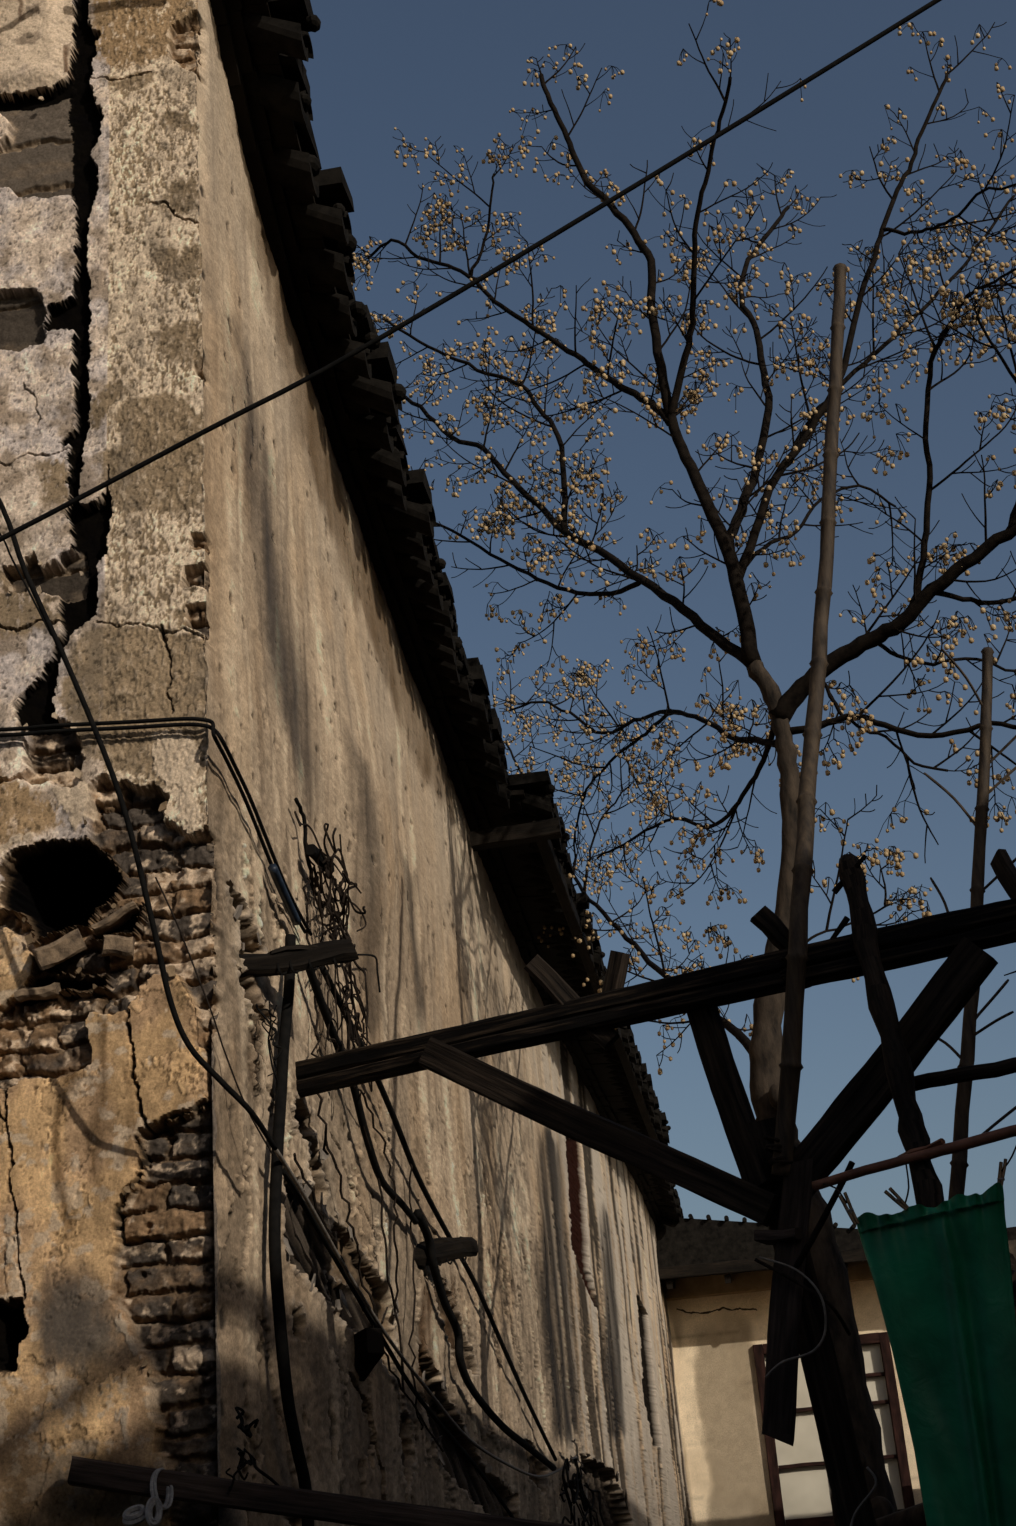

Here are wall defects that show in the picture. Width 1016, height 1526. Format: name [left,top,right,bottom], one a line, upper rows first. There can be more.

spalling [0,96,76,201]
crack [149,200,199,224]
spalling [0,286,52,352]
crack [0,0,153,736]
spalling [0,712,219,1090]
peeling [0,1211,24,1269]
crack [0,1088,27,1299]
spalling [0,1296,29,1374]
damp [43,1282,105,1362]
spalling [109,1103,221,1477]
damp [540,1128,577,1443]
damp [602,1213,624,1437]